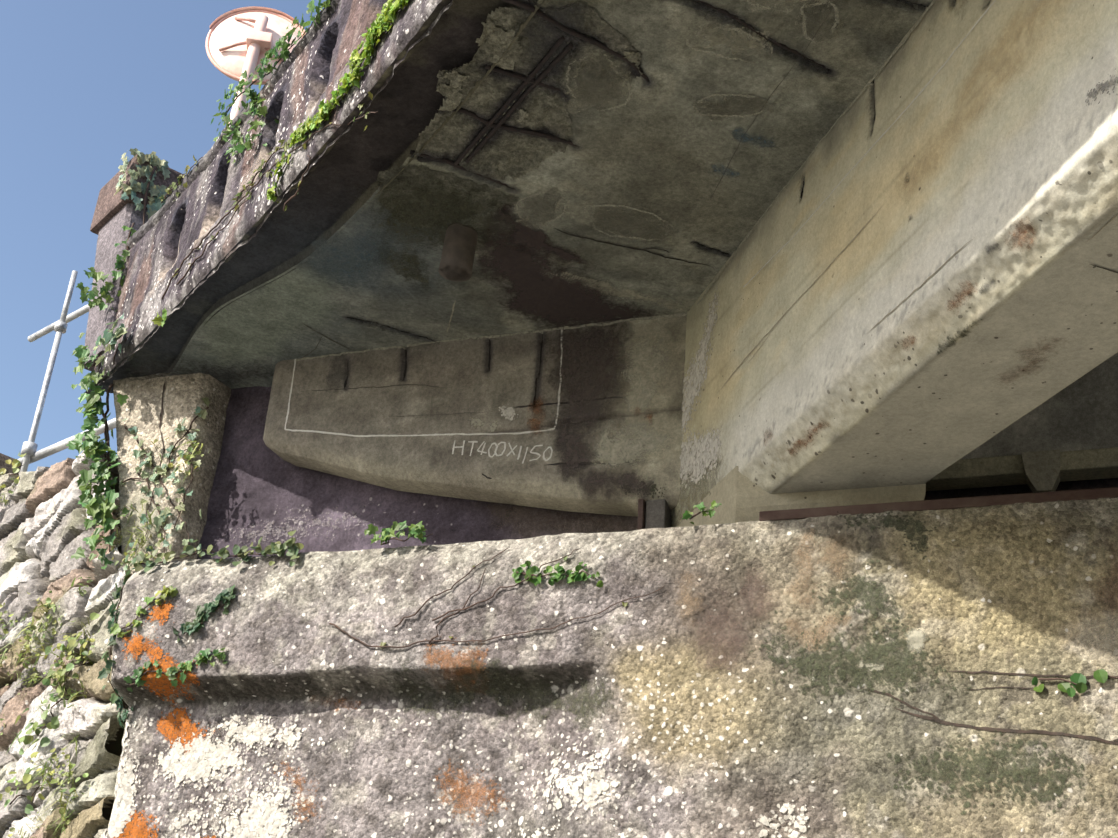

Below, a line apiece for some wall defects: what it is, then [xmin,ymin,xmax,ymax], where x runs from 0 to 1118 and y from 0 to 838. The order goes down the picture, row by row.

spalling [362,0,649,254]
water stain [296,0,935,499]
crack [158,382,166,465]